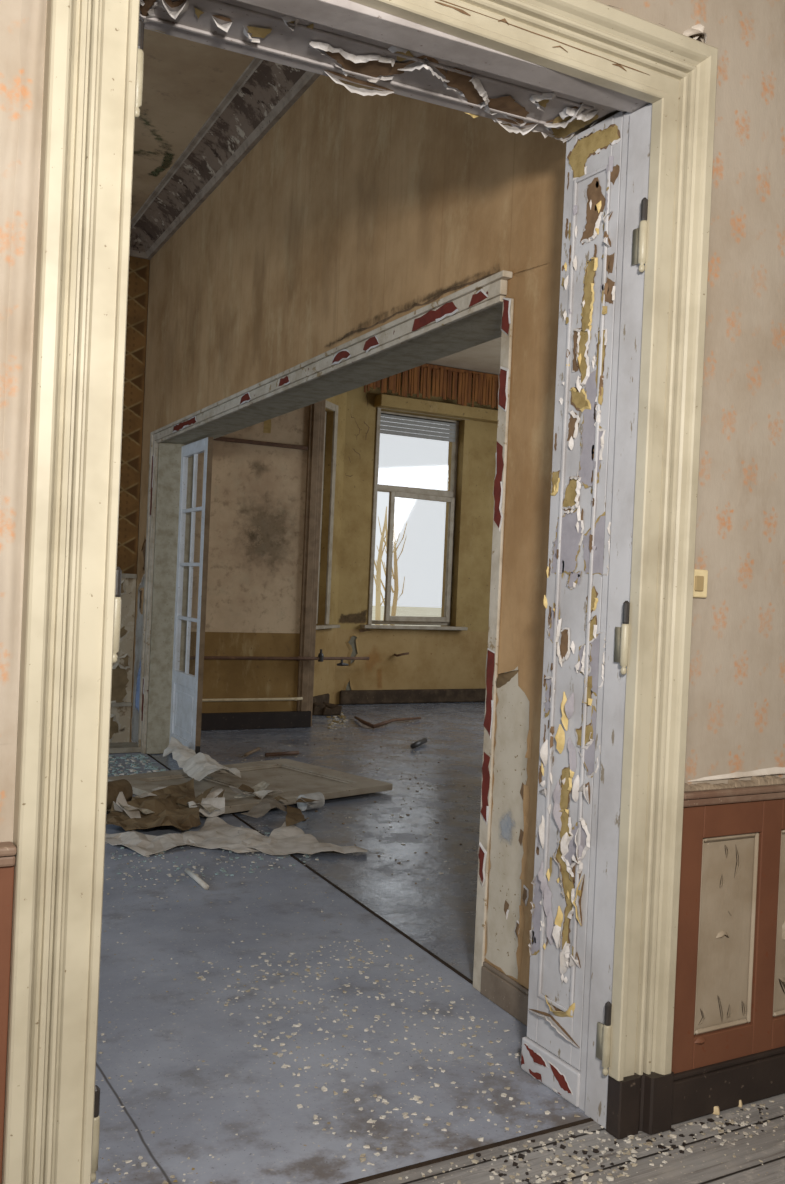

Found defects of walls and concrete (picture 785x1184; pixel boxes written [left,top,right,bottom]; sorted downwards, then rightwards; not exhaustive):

peeling [139,0,272,43]
peeling [173,416,197,432]
flaking render [282,16,621,983]